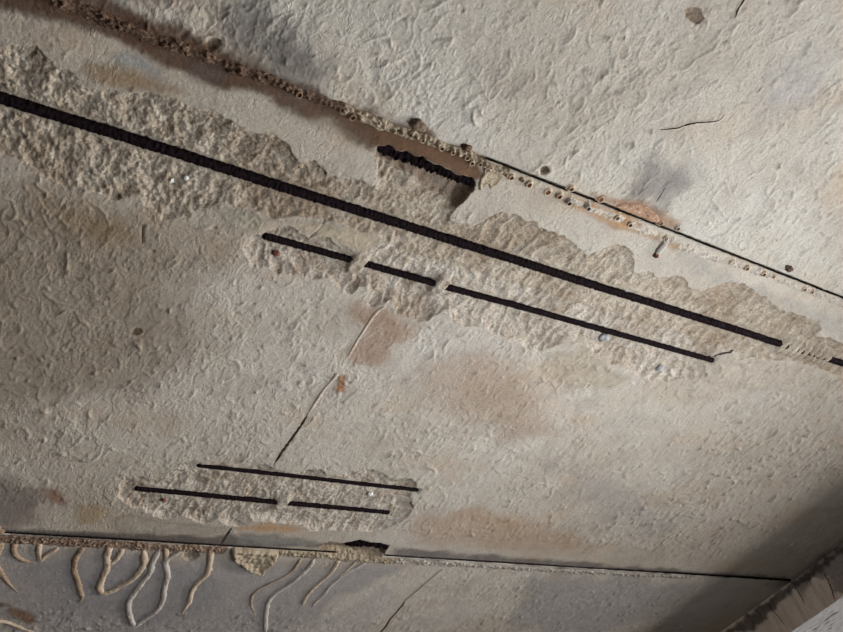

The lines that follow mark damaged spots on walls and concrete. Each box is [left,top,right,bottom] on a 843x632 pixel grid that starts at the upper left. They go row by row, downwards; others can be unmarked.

corrosion [0,0,482,180]
spalling [0,44,843,384]
corrosion [572,200,676,230]
crack [274,306,386,464]
spalling [116,461,419,557]
damp [0,488,737,632]
crack [380,568,444,632]